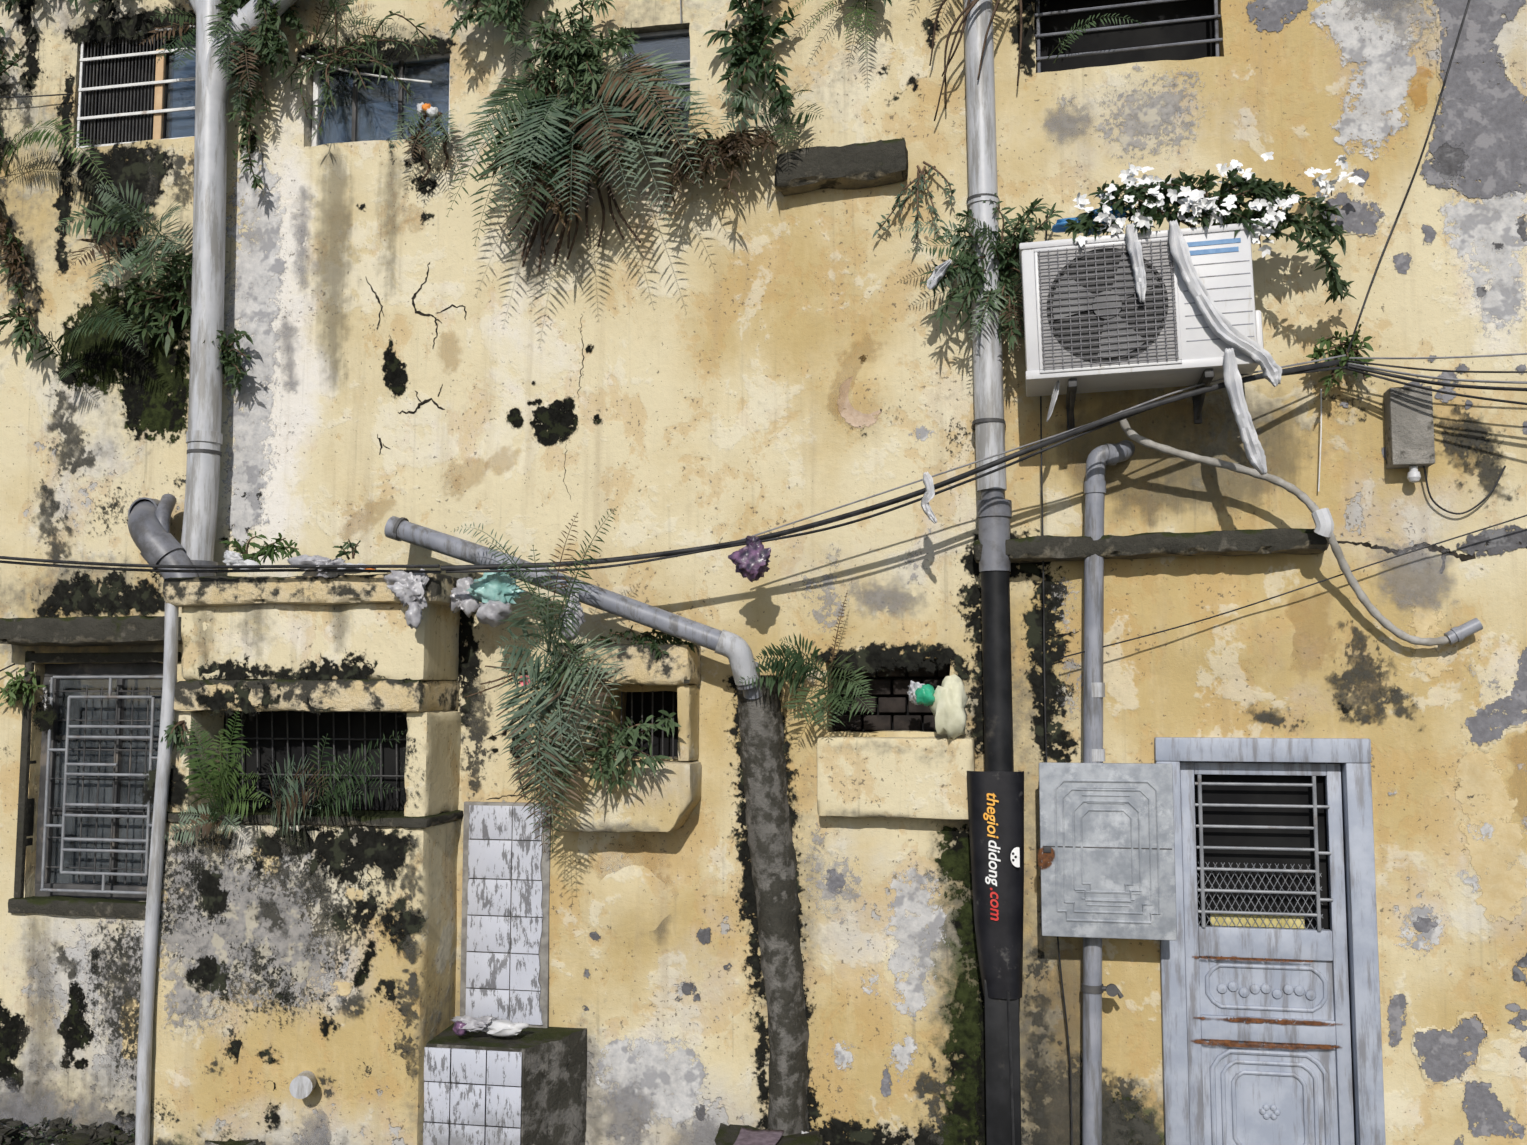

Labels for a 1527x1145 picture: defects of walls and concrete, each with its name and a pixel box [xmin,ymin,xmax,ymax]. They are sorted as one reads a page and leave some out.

leakage [0,0,196,323]
spalling [1246,0,1527,336]
crack [366,262,467,347]
leakage [47,390,140,537]
crack [377,384,445,455]
crack [1337,541,1527,571]
peeling [1408,597,1527,922]
leakage [0,761,426,1145]
leakage [722,676,770,1130]
corrosion [1191,1016,1340,1050]
spalling [1387,994,1527,1145]
spalling [1513,954,1527,984]